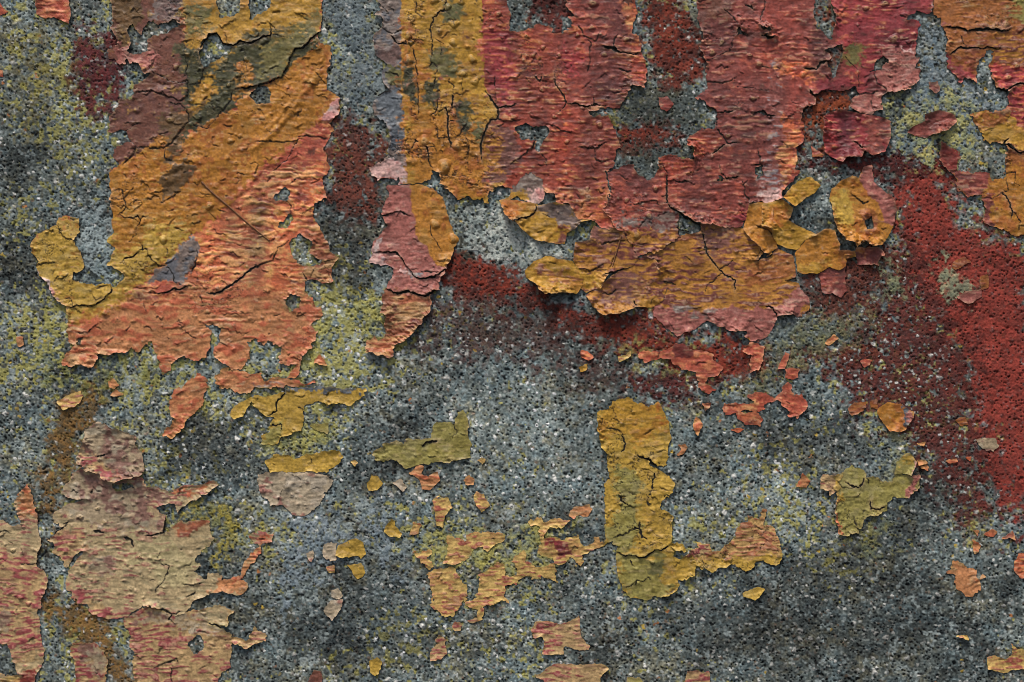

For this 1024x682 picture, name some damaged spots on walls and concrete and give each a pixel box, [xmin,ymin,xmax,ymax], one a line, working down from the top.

crack [946,26,1010,54]
crack [480,90,516,159]
crack [554,79,606,113]
crack [118,188,180,267]
peeling [30,0,367,517]
crack [209,264,261,294]
peeling [365,0,1024,436]
peeling [0,422,274,682]
peeling [367,397,783,661]
crack [608,428,669,586]
peeling [796,442,929,536]